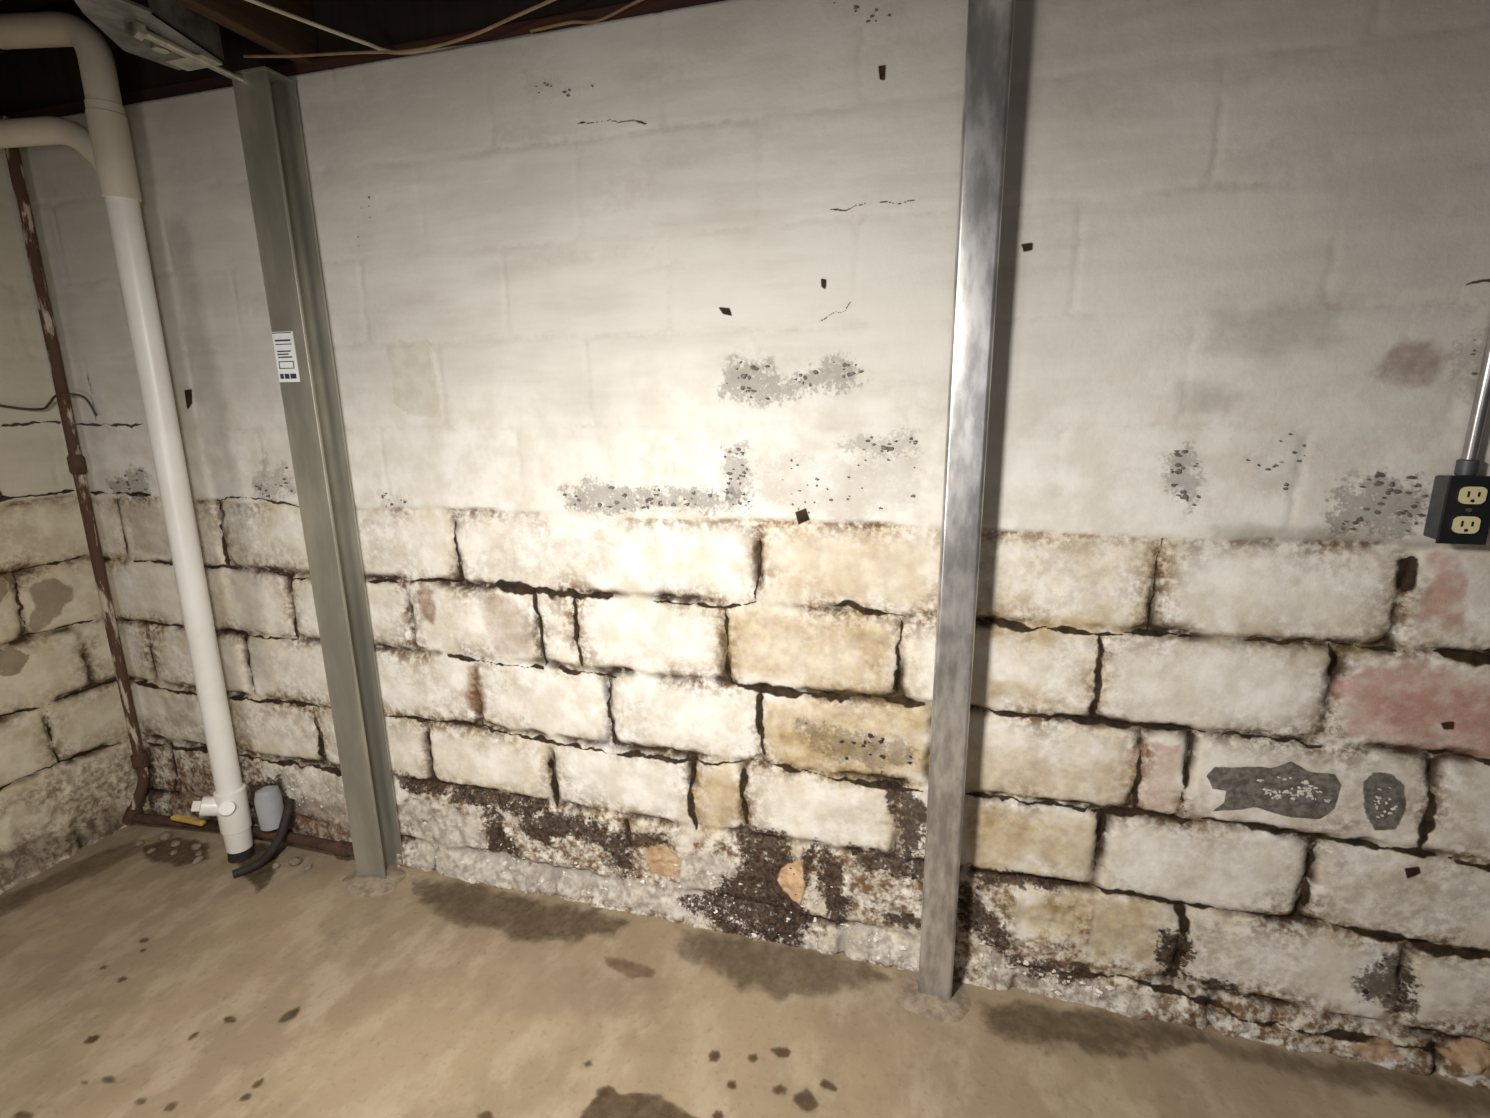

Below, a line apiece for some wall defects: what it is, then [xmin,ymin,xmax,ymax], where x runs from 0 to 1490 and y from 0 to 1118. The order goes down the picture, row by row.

peeling [29,579,72,631]
peeling [0,649,28,676]
peeling [1207,762,1341,819]
peeling [1363,772,1406,830]
leakage [144,838,208,865]
leakage [239,775,335,889]
leakage [392,733,927,961]
leakage [958,864,1201,1053]
leakage [1153,928,1250,998]
leakage [1352,953,1420,1016]
leakage [749,1048,790,1061]
leakage [774,1080,836,1110]